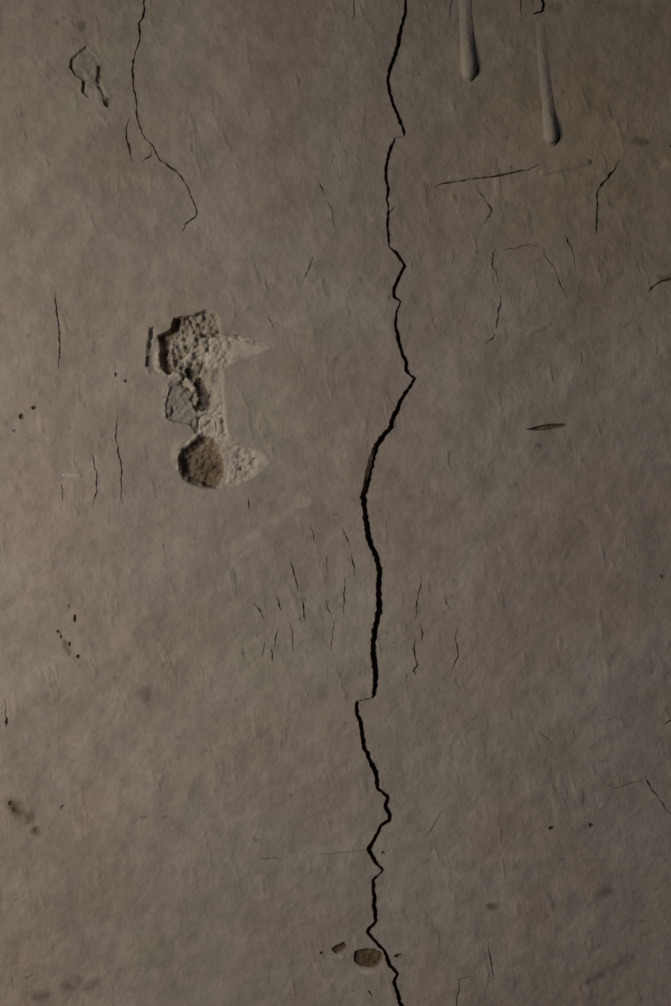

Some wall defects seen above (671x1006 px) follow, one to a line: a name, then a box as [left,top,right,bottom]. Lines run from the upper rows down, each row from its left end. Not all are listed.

crack [125,0,198,231]
crack [435,158,620,235]
crack [486,235,576,343]
flaking render [145,308,270,492]
crack [242,0,424,1006]
crack [445,596,460,688]
flaking render [320,942,402,968]
crack [456,977,468,1006]
crack [487,942,495,979]